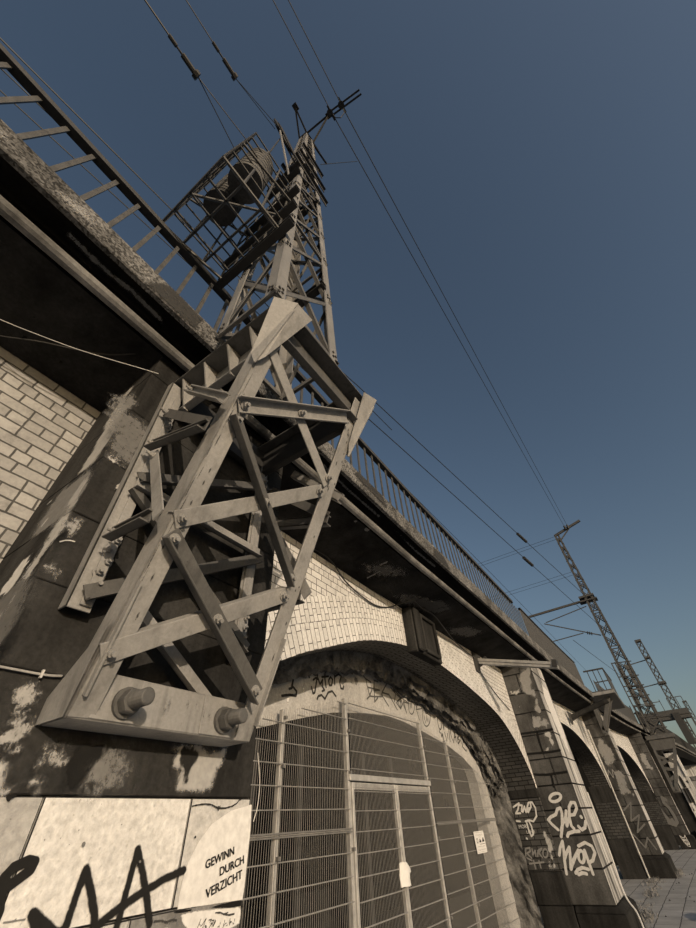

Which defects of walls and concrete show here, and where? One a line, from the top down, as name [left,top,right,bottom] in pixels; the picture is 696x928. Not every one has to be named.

peeling [0,683,39,752]
peeling [520,668,549,728]
peeling [40,748,69,766]
spalling [272,651,544,928]